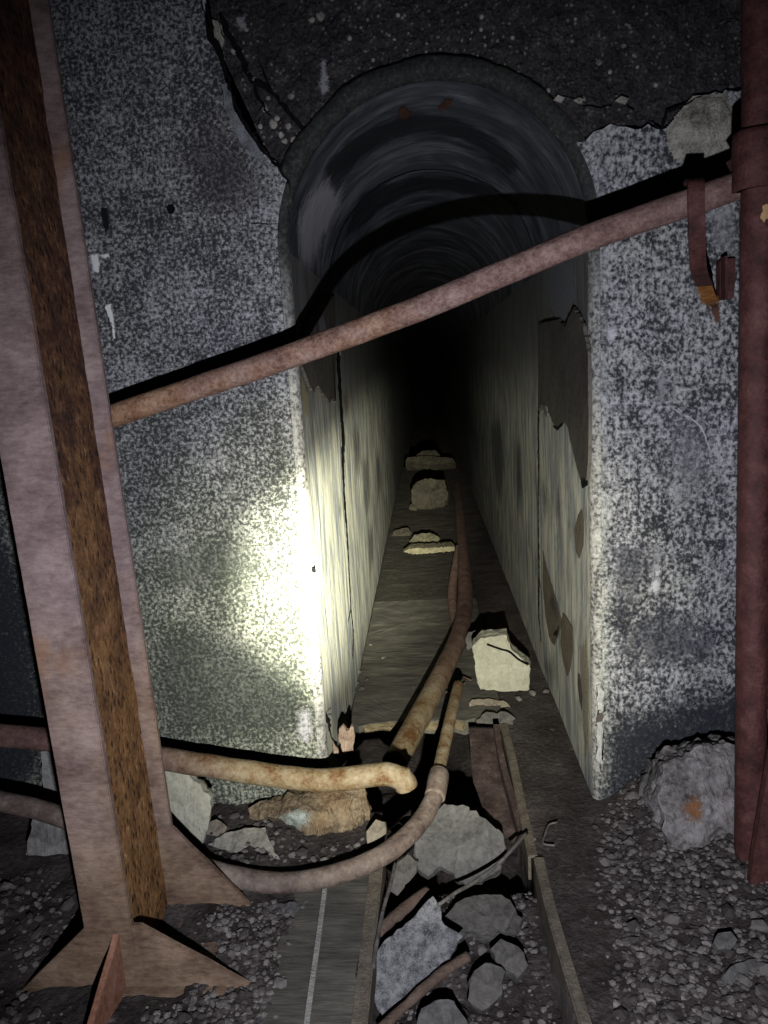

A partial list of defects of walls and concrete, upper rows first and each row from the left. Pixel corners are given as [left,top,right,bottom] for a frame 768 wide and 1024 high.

crack [201,0,305,188]
spalling [209,0,742,167]
peeling [538,308,592,488]
crack [337,352,354,656]
peeling [574,510,584,558]
peeling [543,553,583,710]